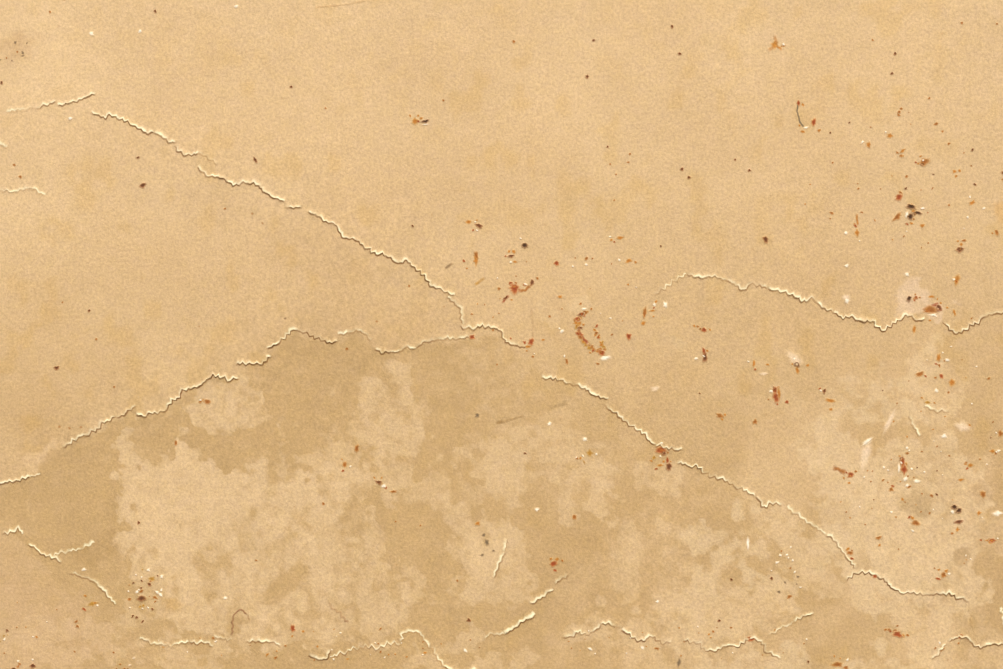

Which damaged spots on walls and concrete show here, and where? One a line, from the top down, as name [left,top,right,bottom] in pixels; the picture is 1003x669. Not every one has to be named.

peeling [0,269,1003,669]
rust [572,302,613,365]